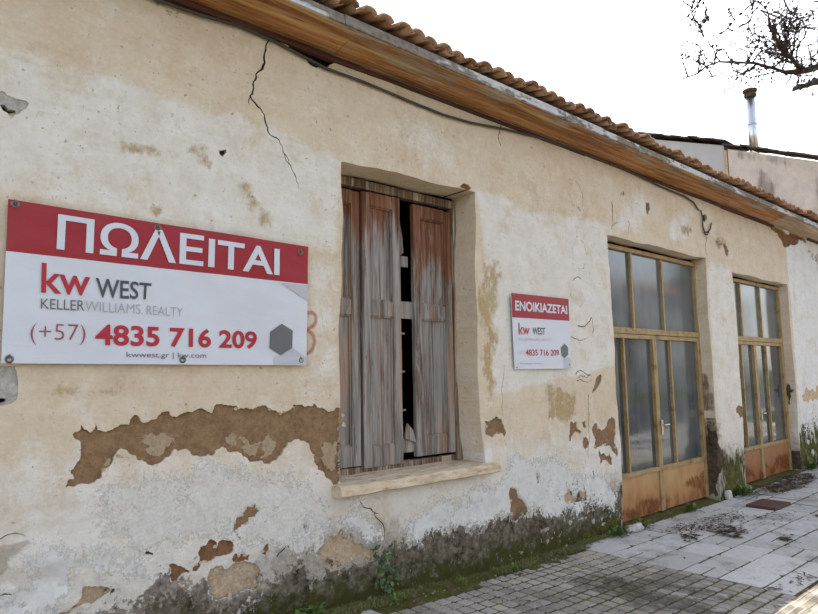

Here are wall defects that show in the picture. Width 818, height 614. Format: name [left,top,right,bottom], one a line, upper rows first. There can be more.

crack [248,40,298,183]
spalling [485,416,506,437]
spalling [569,417,618,465]
damp [791,413,818,470]
peeling [802,385,818,403]
peeling [0,403,385,614]
damp [98,480,623,614]
peeling [400,450,620,551]